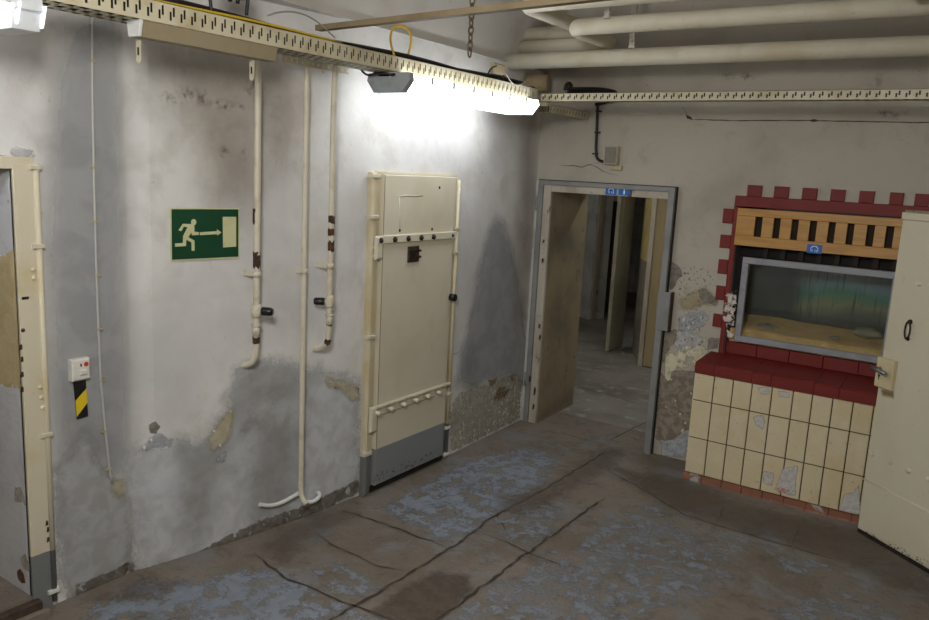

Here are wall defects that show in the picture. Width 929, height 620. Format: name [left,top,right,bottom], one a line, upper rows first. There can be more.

crack [681,105,929,124]
damp [459,222,526,384]
spalling [723,291,737,338]
spalling [656,262,711,441]
peeling [143,422,173,450]
spalling [202,480,359,551]
peeling [376,448,566,545]
spalling [839,486,860,514]
spalling [17,554,30,583]
spalling [76,562,134,595]
peeling [88,558,383,620]
damp [374,572,470,620]